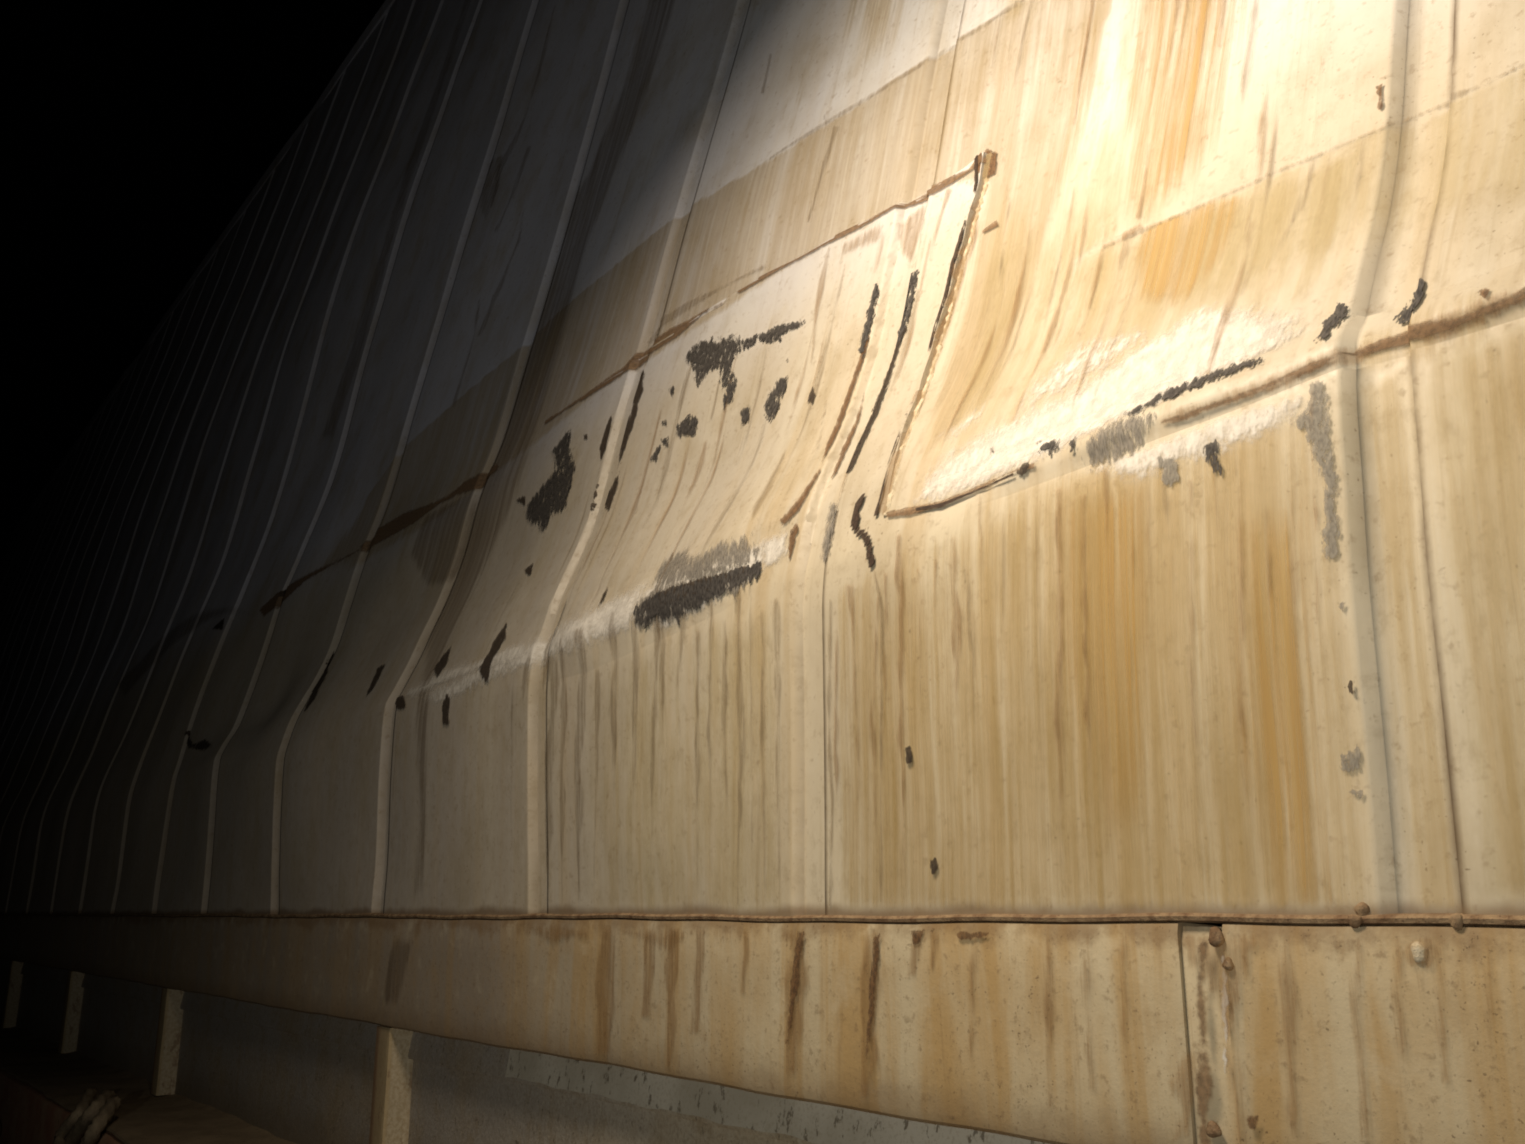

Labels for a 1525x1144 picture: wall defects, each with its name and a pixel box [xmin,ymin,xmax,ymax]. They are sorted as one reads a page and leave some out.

corrosion [738,154,990,292]
corrosion [544,303,722,423]
corrosion [1161,287,1525,423]
peeling [1393,278,1424,324]
peeling [920,302,1348,559]
peeling [395,270,918,726]
peeling [304,652,335,711]
peeling [366,664,385,695]
peeling [1340,747,1363,798]
corrosion [787,931,804,1042]
corrosion [866,933,880,1054]
corrosion [1196,942,1229,1144]